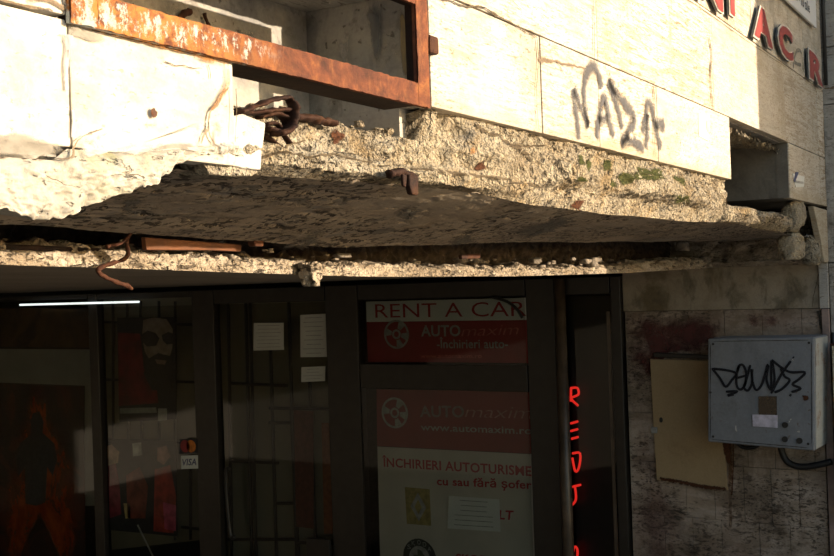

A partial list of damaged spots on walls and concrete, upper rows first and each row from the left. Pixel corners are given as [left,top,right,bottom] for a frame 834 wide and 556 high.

crack [165,61,238,155]
peeling [83,123,203,157]
rust [299,113,345,144]
spalling [233,95,793,241]
flaking render [0,236,299,275]
flaking render [309,255,714,277]
crack [812,274,834,329]